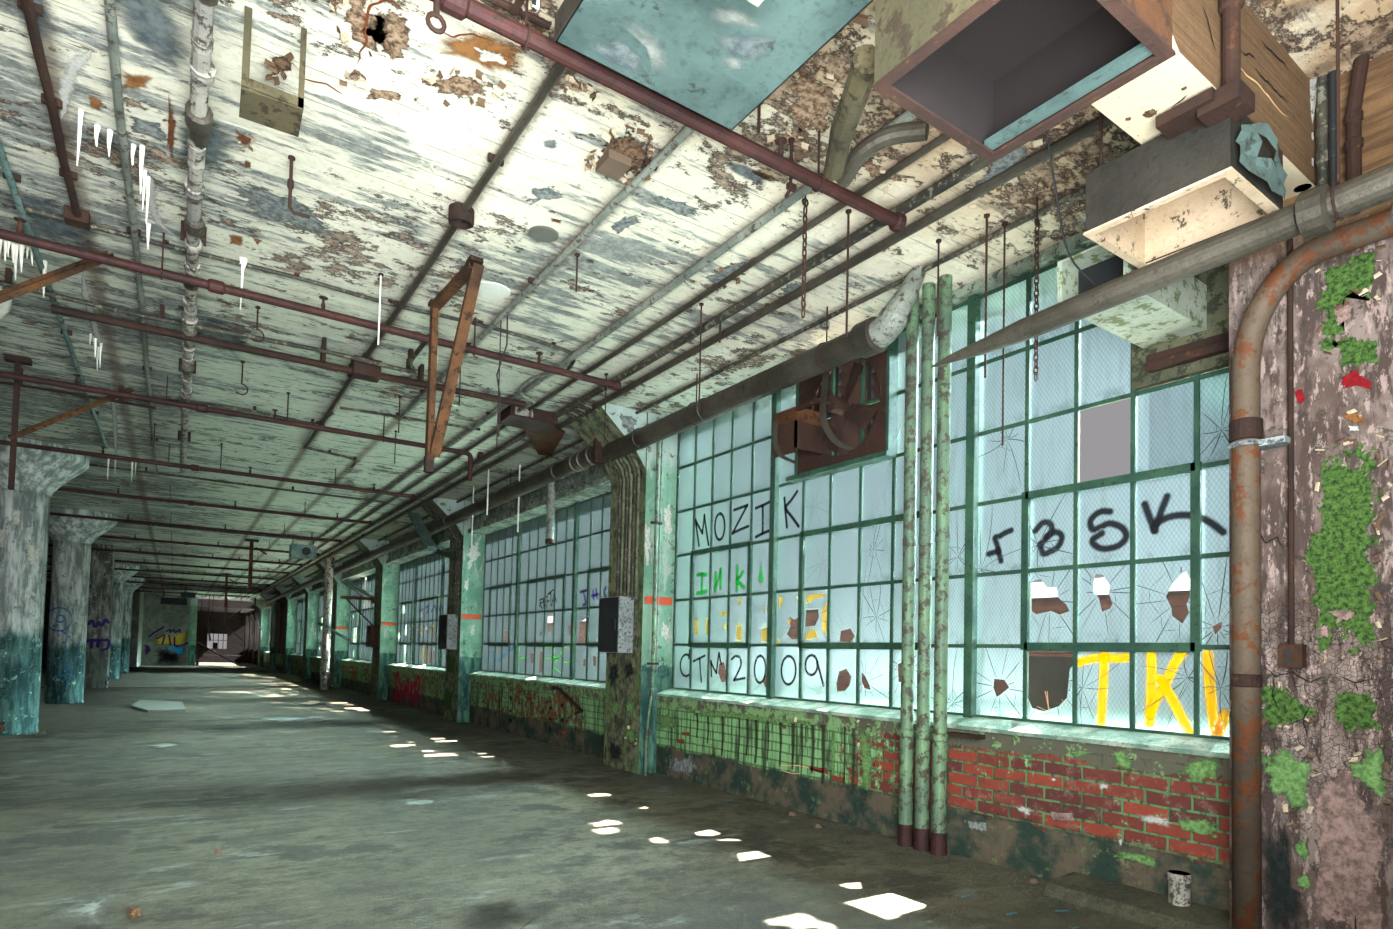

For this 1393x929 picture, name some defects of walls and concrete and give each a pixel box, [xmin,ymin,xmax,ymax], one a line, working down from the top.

peeling [295,0,411,62]
peeling [517,2,552,37]
spalling [264,52,299,86]
peeling [339,47,512,108]
peeling [1301,409,1393,664]
spalling [1261,681,1393,929]
damp [1264,831,1301,929]